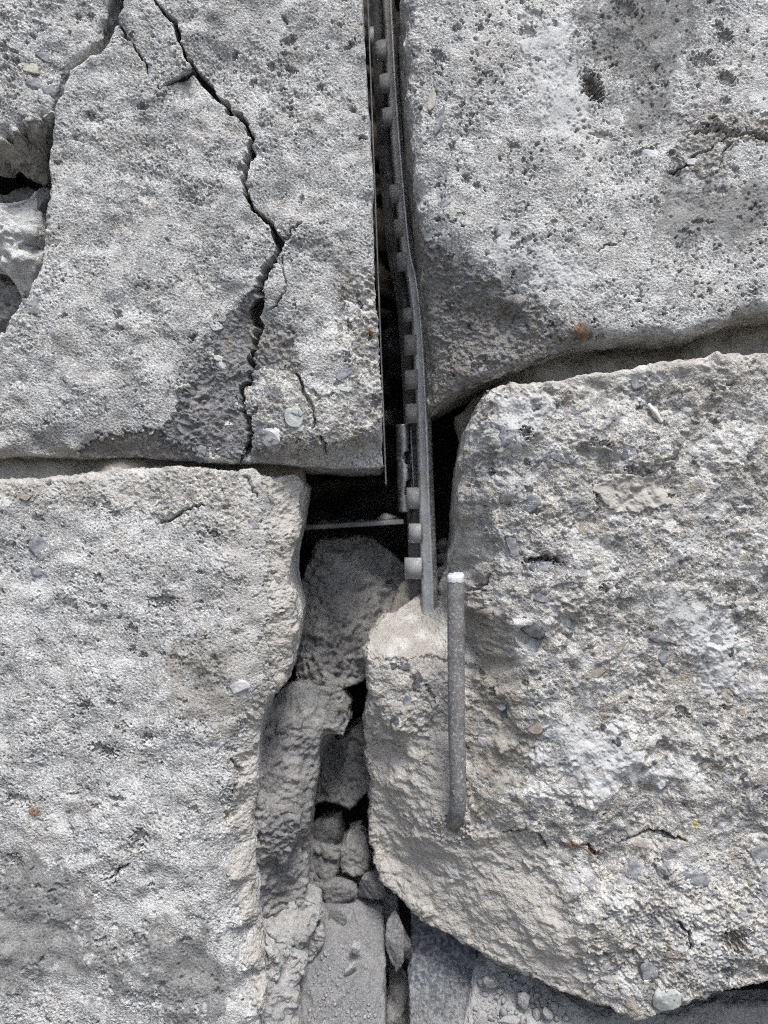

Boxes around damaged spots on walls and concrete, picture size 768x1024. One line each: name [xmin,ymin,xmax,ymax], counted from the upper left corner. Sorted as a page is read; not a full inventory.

crack [171,24,299,495]
spalling [0,265,383,1024]
crack [637,828,685,840]